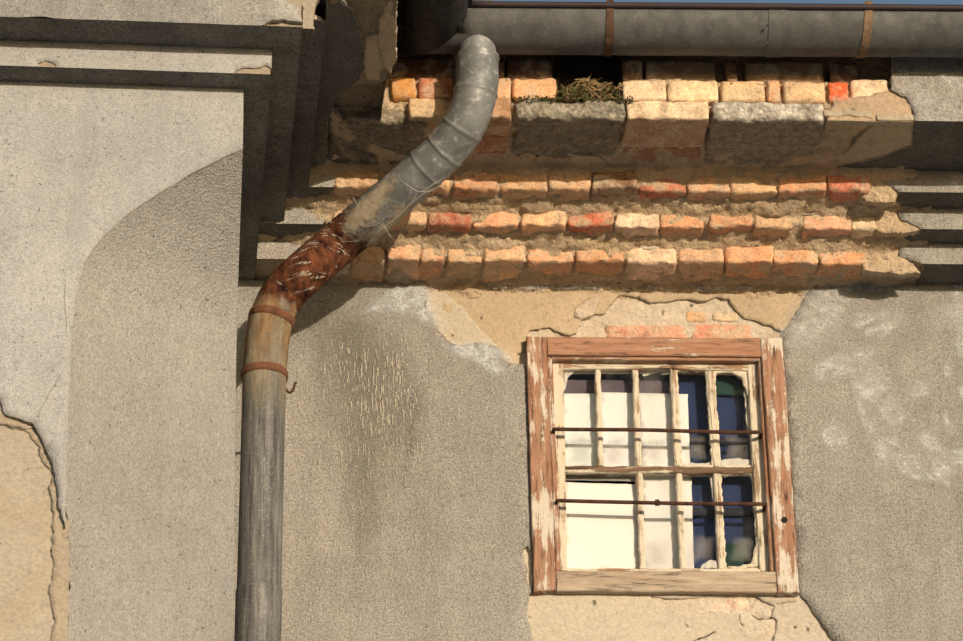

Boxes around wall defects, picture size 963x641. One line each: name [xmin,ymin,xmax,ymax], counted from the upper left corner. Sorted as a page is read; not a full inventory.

spalling [235,66,271,74]
spalling [258,0,456,245]
spalling [327,55,931,366]
spalling [255,259,285,280]
leakage [369,284,436,322]
leakage [446,339,510,372]
spalling [0,403,70,641]
leakage [293,333,463,639]
leakage [877,435,963,481]
spalling [523,547,834,641]